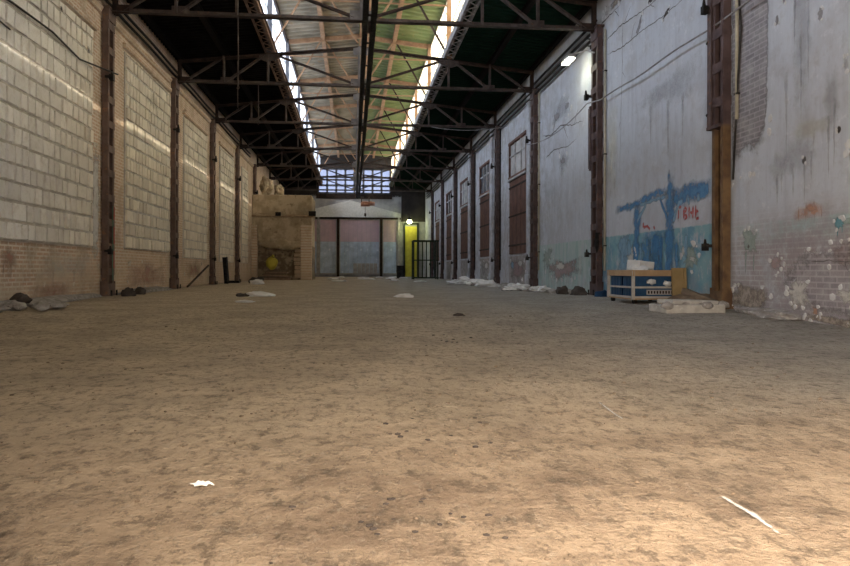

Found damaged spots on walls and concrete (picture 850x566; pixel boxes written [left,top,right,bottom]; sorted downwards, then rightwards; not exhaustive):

flaking render [768,215,850,328]